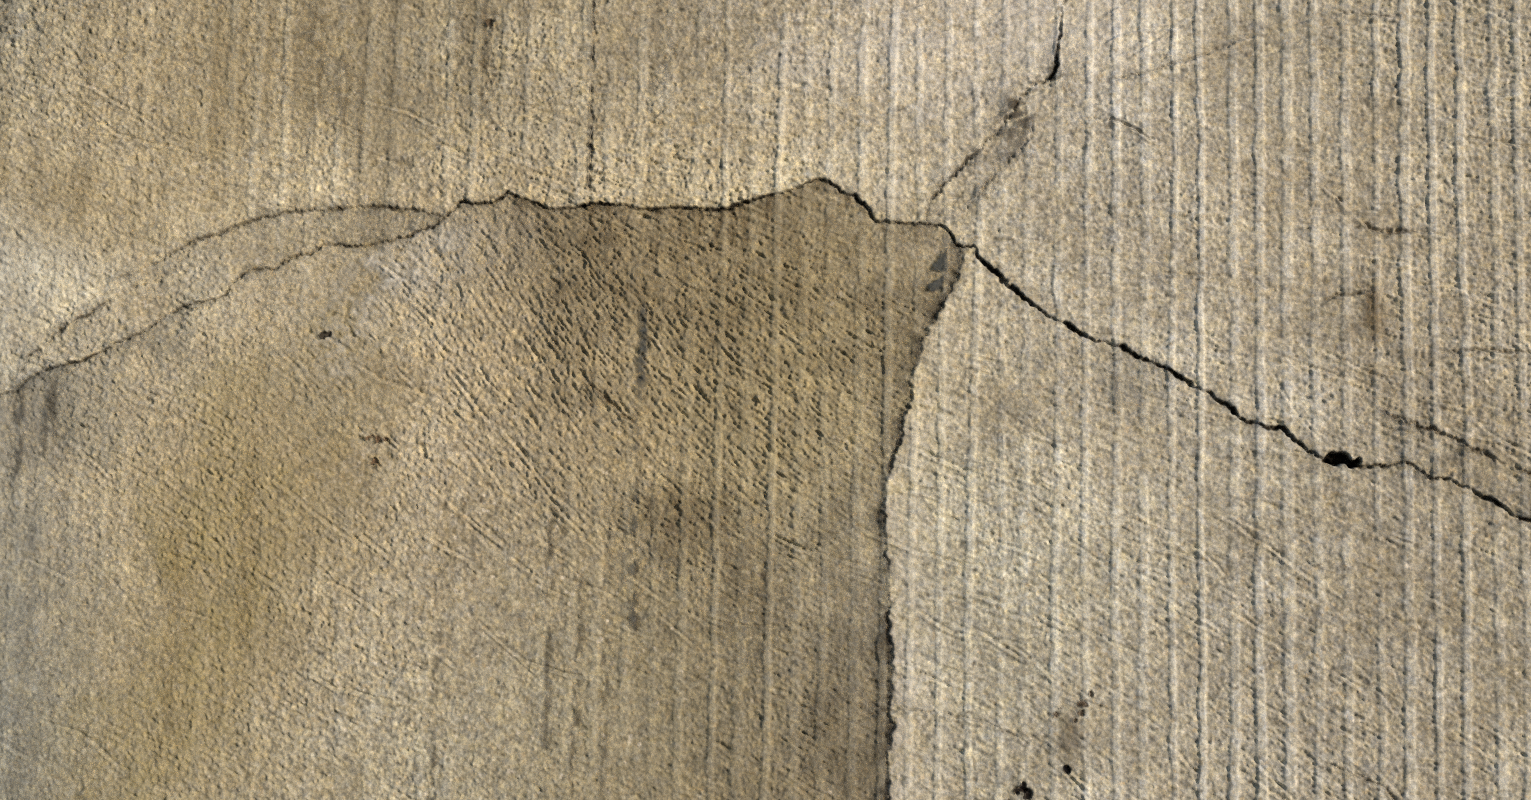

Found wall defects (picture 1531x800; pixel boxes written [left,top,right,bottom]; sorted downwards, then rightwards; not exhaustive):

crack [189,0,1477,479]
crack [25,302,130,382]
damp [354,233,432,334]
damp [556,183,826,443]
crack [1480,496,1531,522]
crack [885,611,894,659]
damp [890,630,903,697]
crack [885,701,895,800]
damp [889,719,902,800]